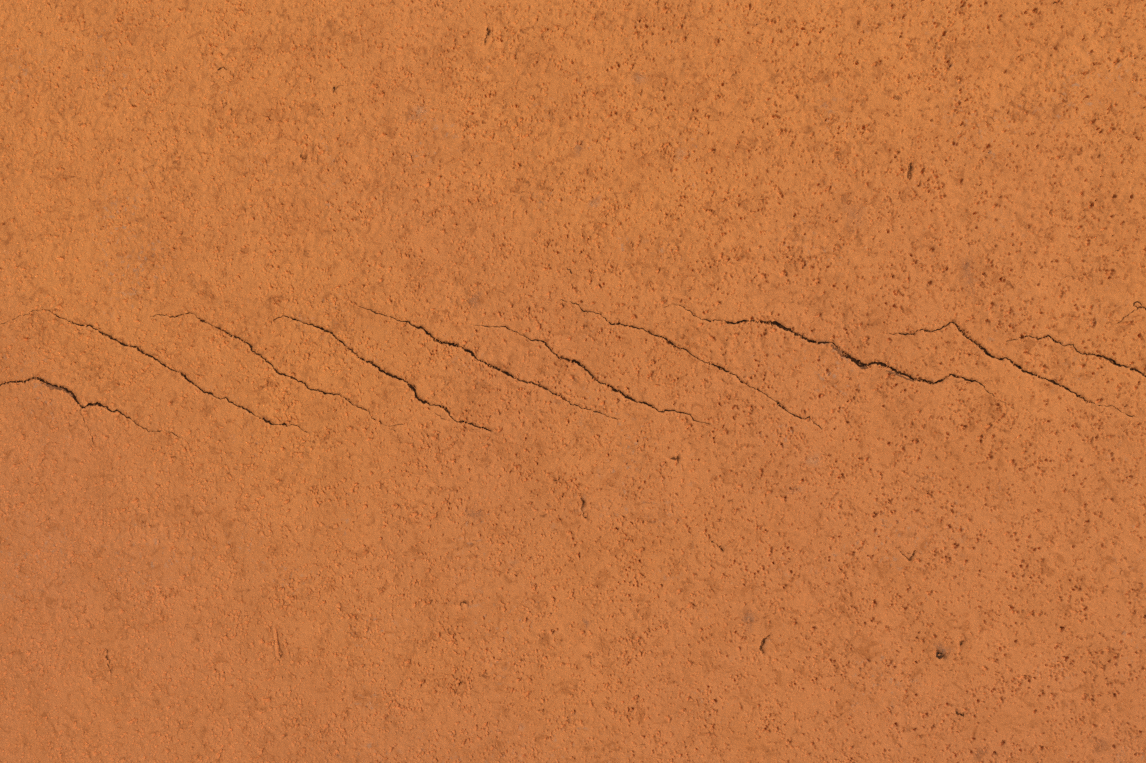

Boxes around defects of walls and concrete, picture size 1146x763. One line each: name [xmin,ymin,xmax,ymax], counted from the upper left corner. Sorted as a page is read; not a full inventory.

crack [0,377,180,445]
crack [2,309,306,432]
crack [150,312,491,432]
crack [359,306,709,424]
crack [561,299,822,429]
crack [666,305,1014,409]
crack [889,321,1146,417]